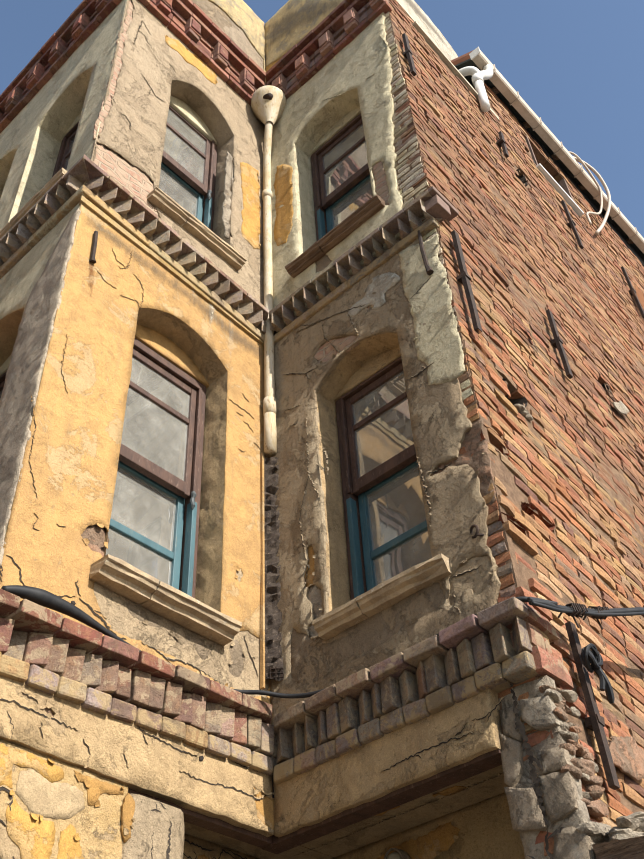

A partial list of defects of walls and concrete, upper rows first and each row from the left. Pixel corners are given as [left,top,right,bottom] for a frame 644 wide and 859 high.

flaking render [165,35,218,85]
flaking render [221,151,261,249]
flaking render [273,164,294,246]
crack [98,251,144,309]
flaking render [346,234,465,385]
crack [0,548,27,586]
crack [0,692,91,768]
flaking render [0,743,135,859]
crack [151,802,248,859]
crack [139,727,274,800]
crack [380,684,565,859]
spalling [539,685,609,818]